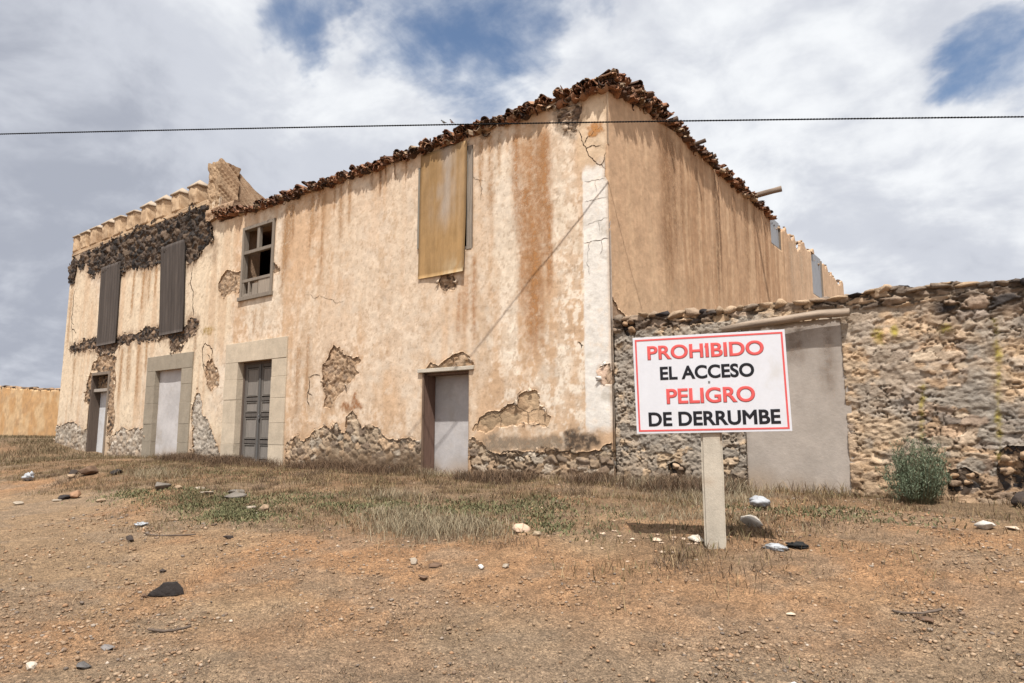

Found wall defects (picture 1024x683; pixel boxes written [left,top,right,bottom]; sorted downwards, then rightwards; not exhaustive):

crack [579,126,611,267]
spalling [68,202,214,285]
spalling [219,270,241,299]
spalling [53,422,87,451]
spalling [68,318,199,457]
spalling [189,359,220,458]
spalling [320,346,361,408]
spalling [284,411,421,470]
spalling [427,352,474,369]
spalling [468,387,615,480]